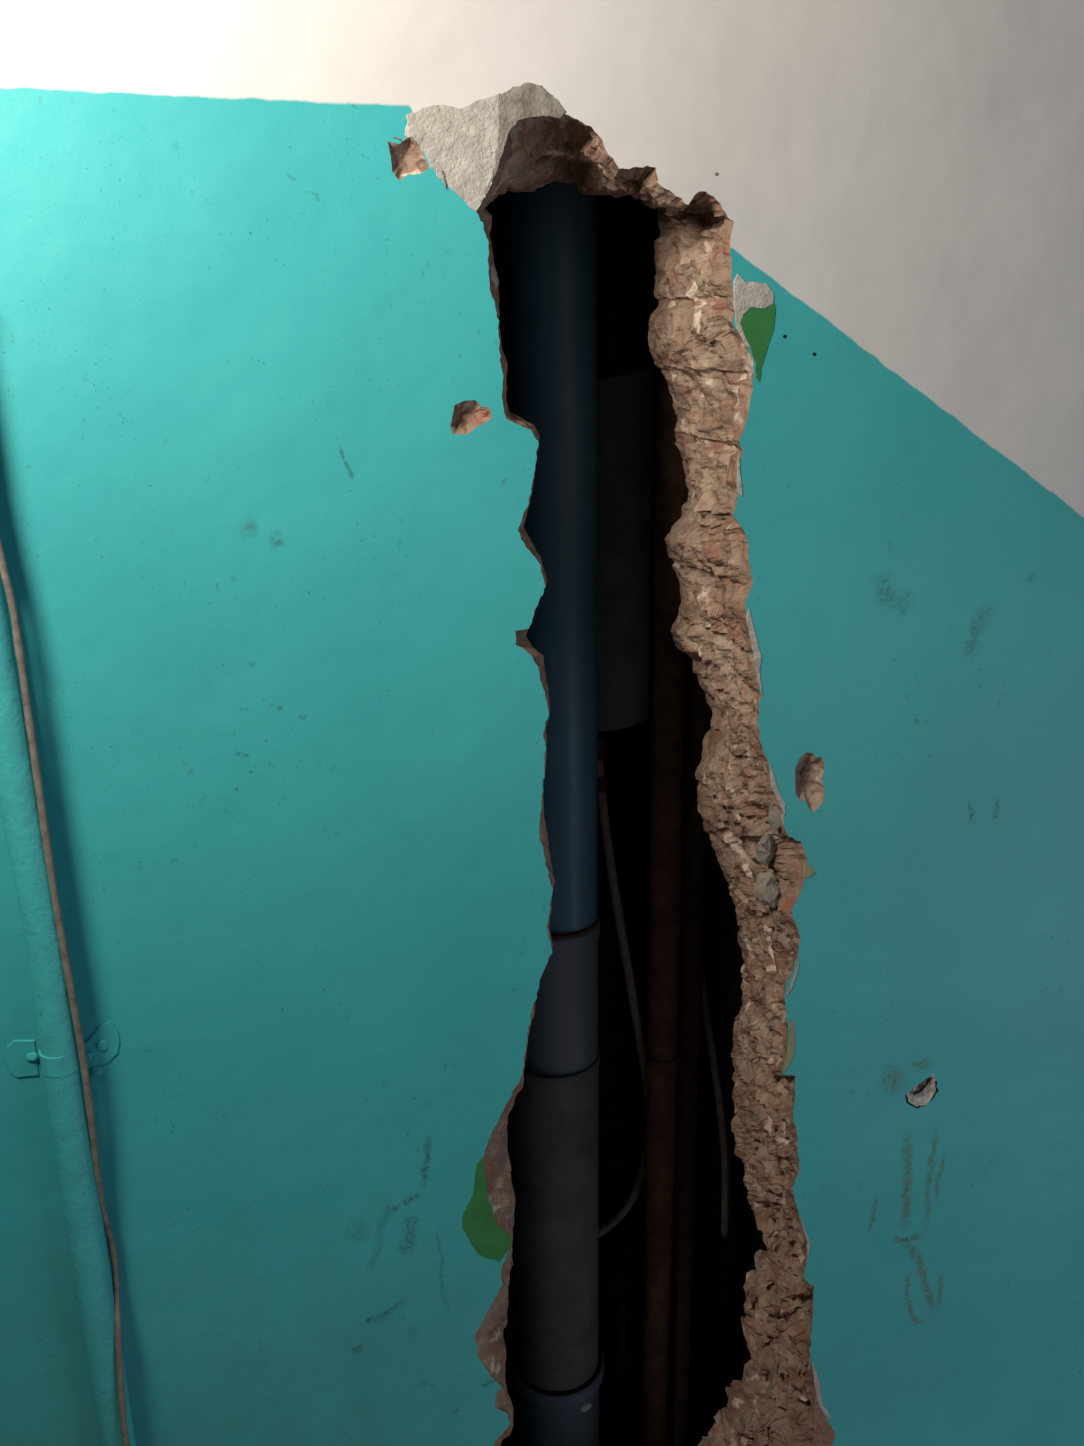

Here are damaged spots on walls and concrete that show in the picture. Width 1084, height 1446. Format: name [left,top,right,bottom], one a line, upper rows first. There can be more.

spalling [388,83,836,1446]
flaking render [905,1073,939,1108]